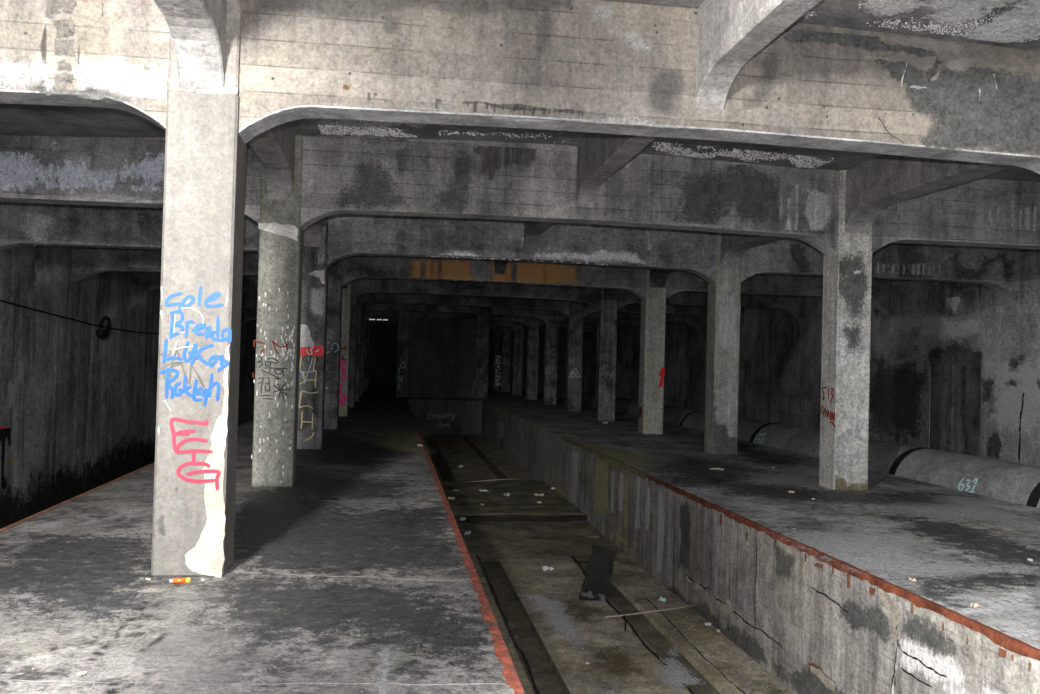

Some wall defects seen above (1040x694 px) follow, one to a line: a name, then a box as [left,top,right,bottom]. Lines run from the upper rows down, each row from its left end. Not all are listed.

water stain [0,0,168,102]
water stain [860,0,1040,43]
water stain [783,30,1040,153]
water stain [334,159,406,209]
water stain [429,146,535,214]
spalling [185,344,230,578]
crack [891,626,947,694]